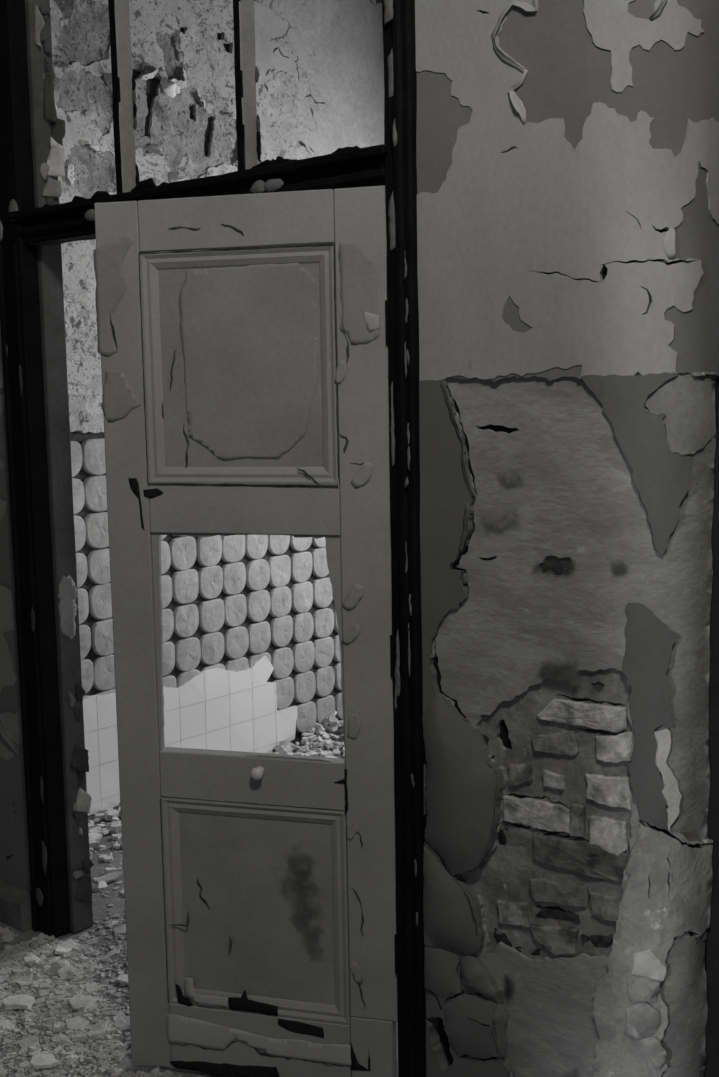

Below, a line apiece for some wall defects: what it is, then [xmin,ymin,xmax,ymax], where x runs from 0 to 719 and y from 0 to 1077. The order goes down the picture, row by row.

peeling [34,0,116,221]
peeling [131,28,237,191]
peeling [249,114,297,193]
peeling [416,70,472,194]
peeling [491,0,719,157]
peeling [0,199,18,241]
crack [538,260,692,282]
peeling [0,583,18,693]
flaking render [432,162,719,1077]
peeling [0,710,23,760]
peeling [166,1013,352,1067]